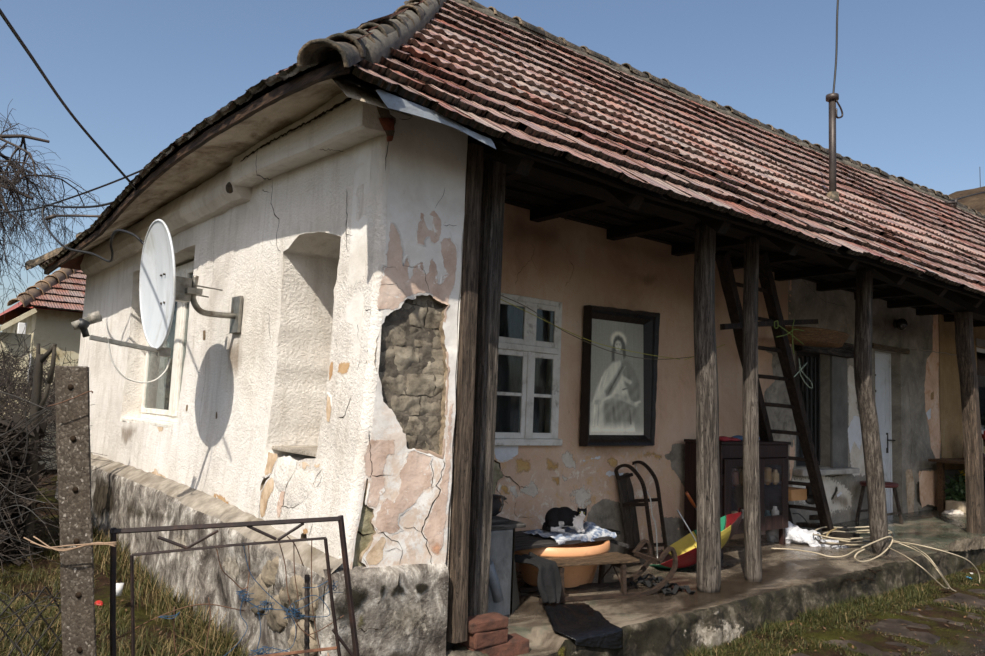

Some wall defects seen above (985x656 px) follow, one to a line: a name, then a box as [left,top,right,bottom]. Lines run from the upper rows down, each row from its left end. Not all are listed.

crack [240,98,352,251]
flaking render [352,211,459,568]
flaking render [259,452,285,518]
crack [372,461,445,585]
peeling [493,446,530,498]
water stain [624,623,672,656]
water stain [682,564,792,650]